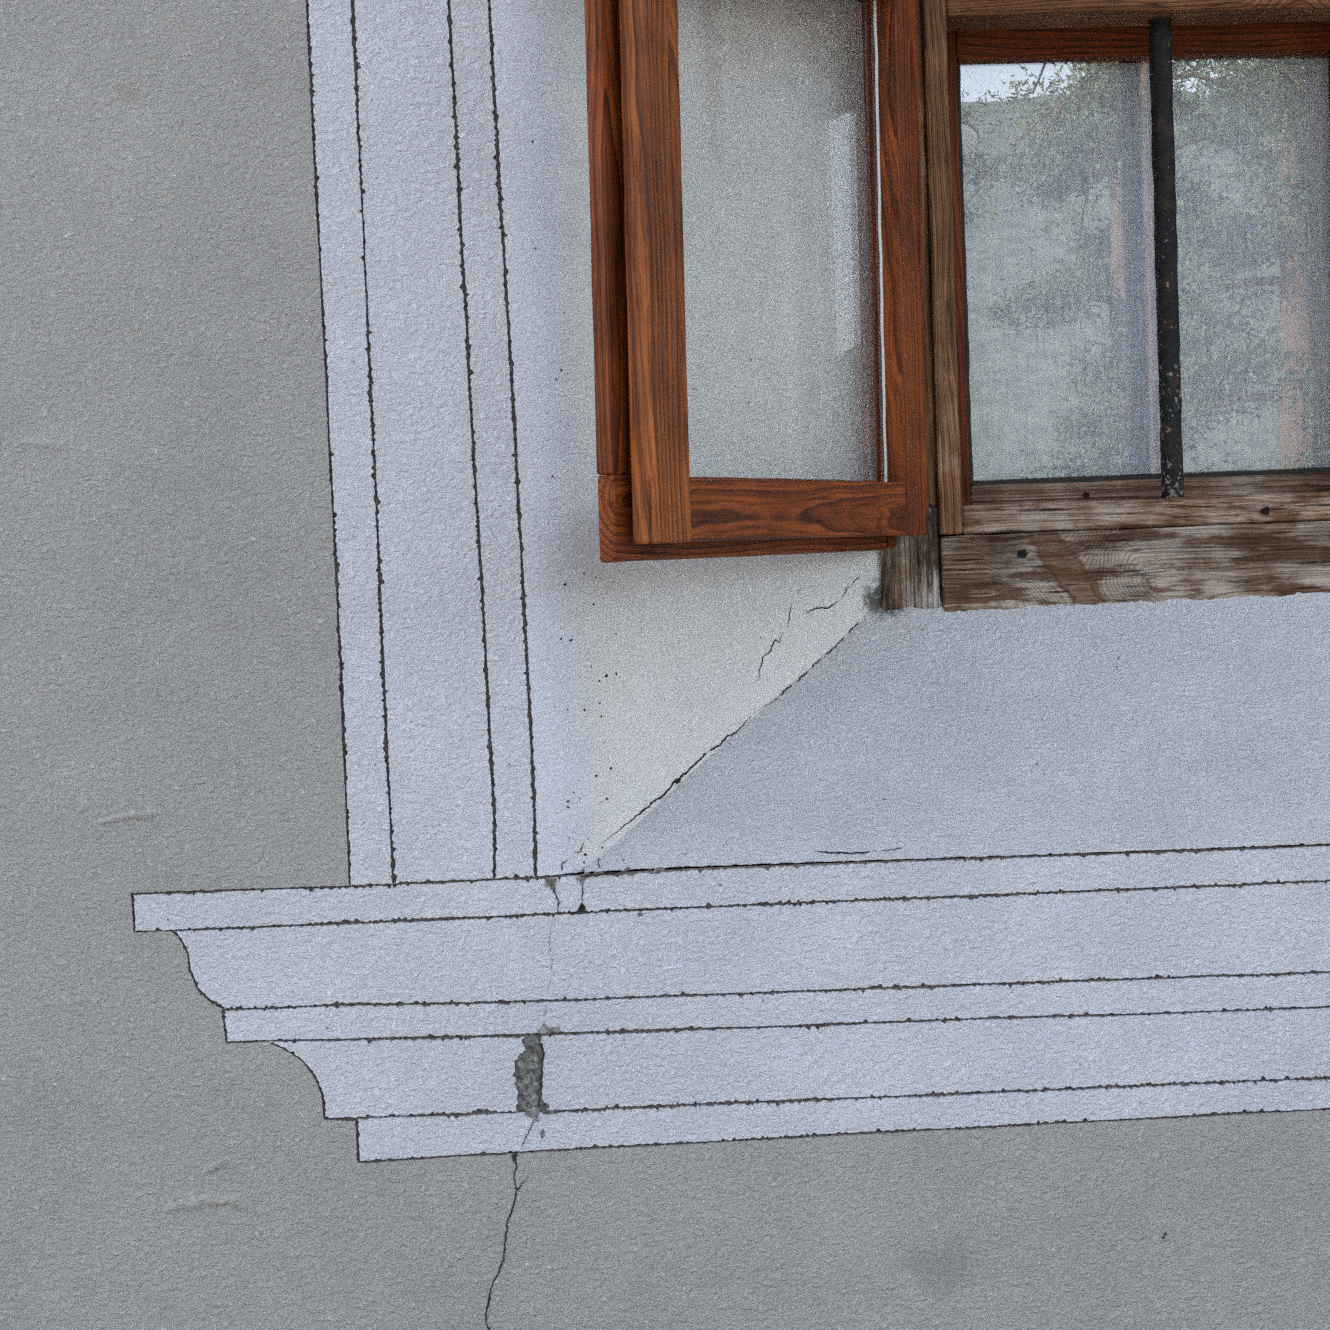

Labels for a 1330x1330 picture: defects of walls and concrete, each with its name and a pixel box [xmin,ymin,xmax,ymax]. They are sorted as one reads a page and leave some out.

crack [544,576,870,1016]
crack [812,847,900,855]
spalling [515,1024,560,1118]
crack [485,1115,544,1330]